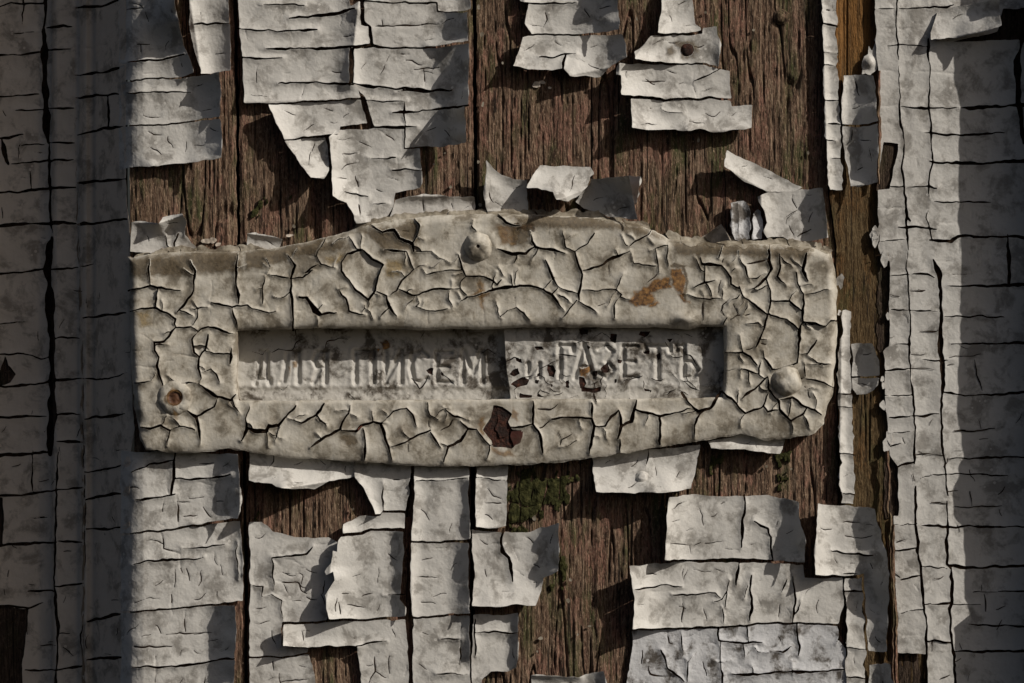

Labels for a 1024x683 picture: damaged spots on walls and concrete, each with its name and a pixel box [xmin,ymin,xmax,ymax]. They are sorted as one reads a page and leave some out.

peeling [130,214,196,253]
crack [0,0,669,683]
peeling [118,0,642,224]
peeling [514,0,752,132]
rust [630,268,686,307]
crack [512,0,1024,683]
peeling [702,0,898,243]
peeling [120,451,560,683]
peeling [531,671,607,683]